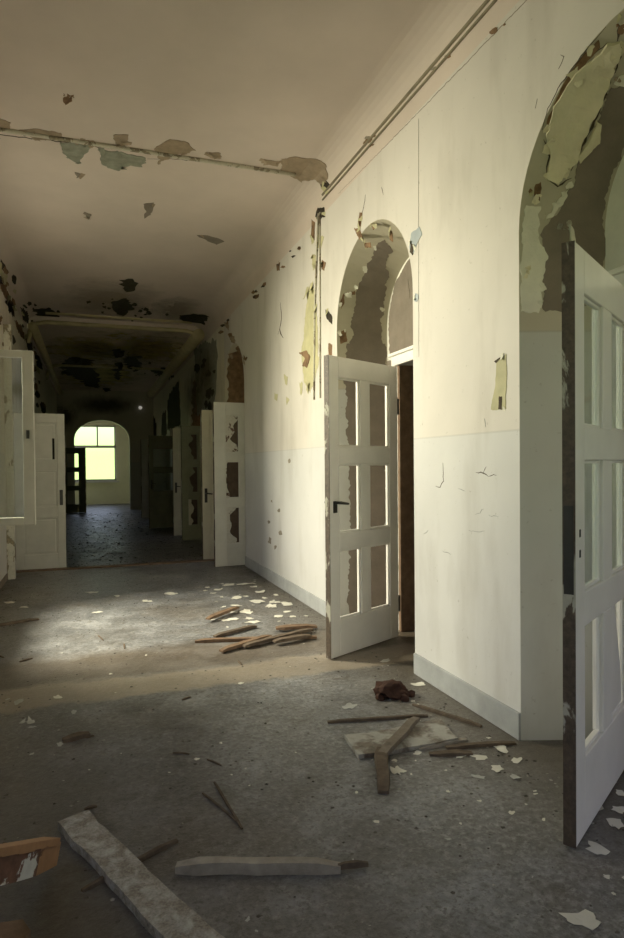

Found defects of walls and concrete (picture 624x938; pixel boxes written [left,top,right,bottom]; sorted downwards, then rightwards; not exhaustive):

flaking render [0,119,146,179]
flaking render [259,156,330,195]
peeling [520,40,624,313]
peeling [299,207,422,395]
flaking render [0,260,46,413]
flaking render [191,319,248,426]
peeling [343,380,356,445]
peeling [370,384,385,446]
peeling [491,353,507,411]
peeling [370,465,386,527]
peeling [347,549,357,614]
peeling [371,545,386,608]